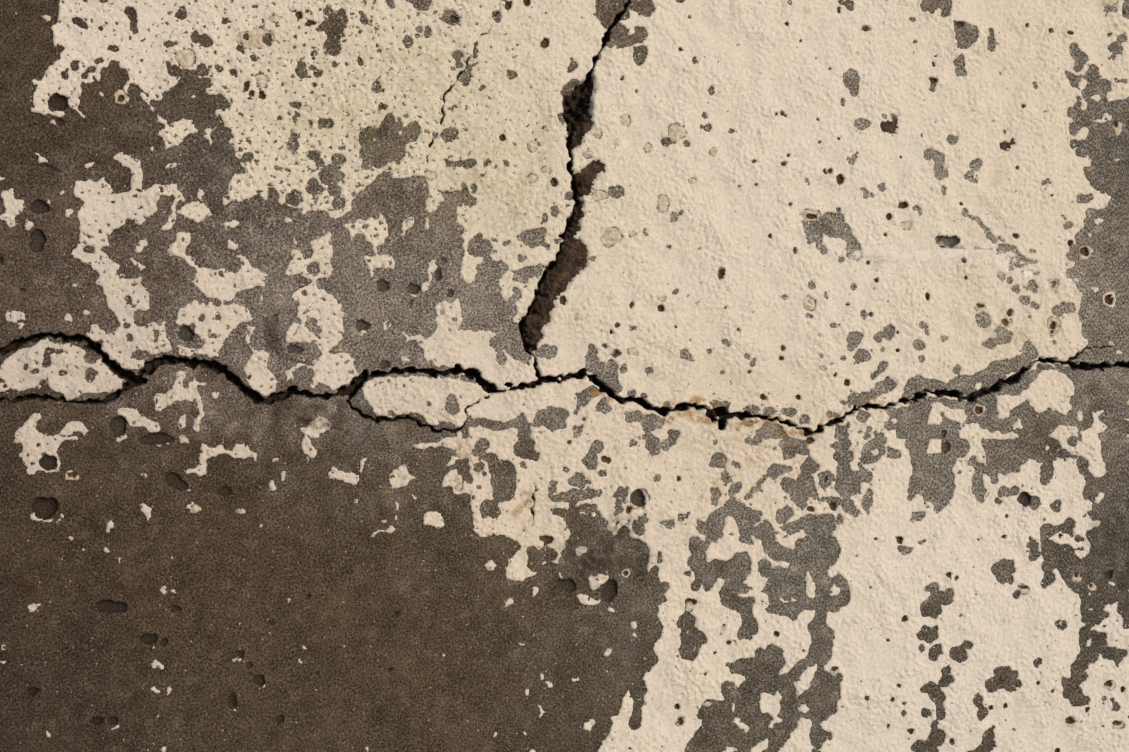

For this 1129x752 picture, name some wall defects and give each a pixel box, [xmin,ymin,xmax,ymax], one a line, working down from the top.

peeling [0,0,670,752]
crack [0,0,1129,437]
peeling [624,401,680,458]
peeling [838,0,854,12]
peeling [659,32,1129,752]
peeling [909,0,999,77]